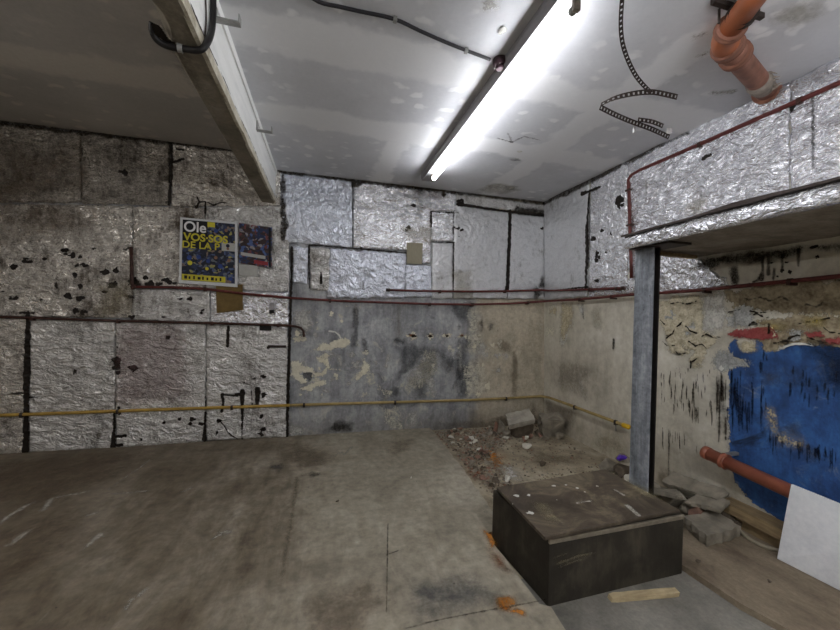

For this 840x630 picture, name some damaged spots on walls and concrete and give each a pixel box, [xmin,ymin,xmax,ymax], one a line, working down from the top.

peeling [290,310,405,399]
crack [660,301,720,369]
crack [728,296,840,344]
water stain [661,369,767,442]
peeling [659,280,840,503]
peeling [733,472,788,521]